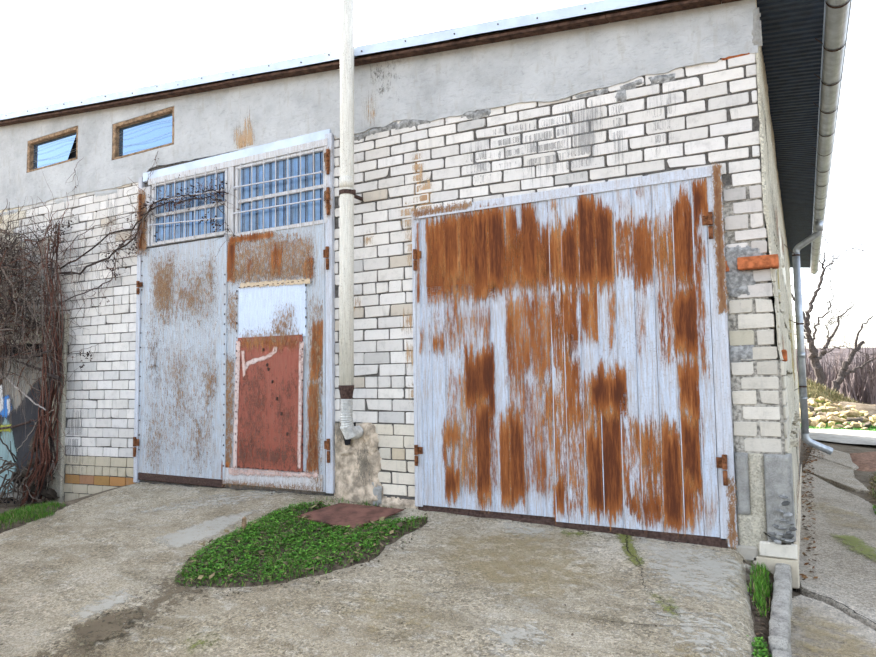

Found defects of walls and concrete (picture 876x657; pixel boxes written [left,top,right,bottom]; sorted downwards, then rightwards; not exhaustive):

flaking render [575,73,676,102]
corrosion [234,116,254,149]
flaking render [354,119,431,141]
flaking render [461,109,491,121]
corrosion [136,188,326,492]
corrosion [400,154,739,550]